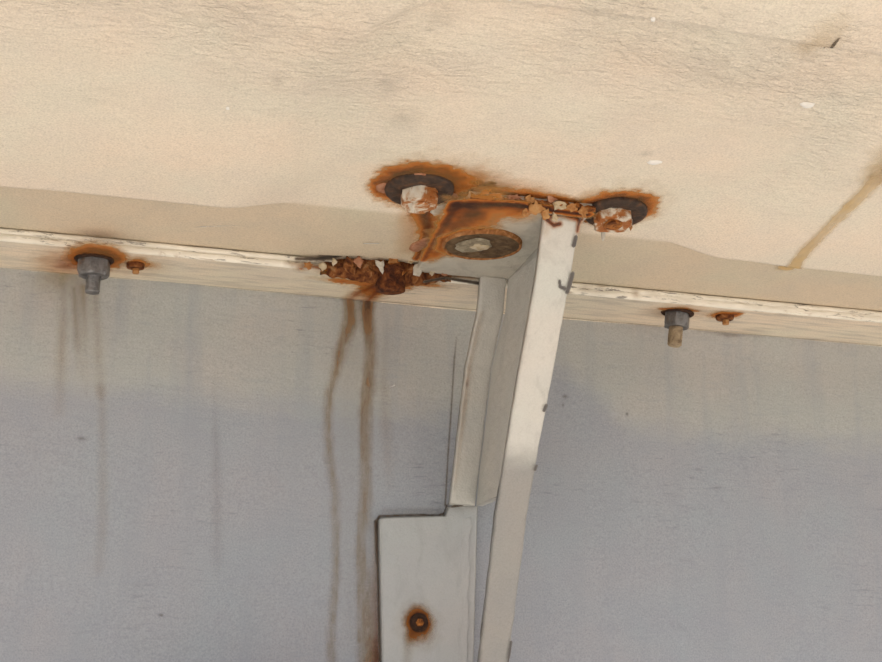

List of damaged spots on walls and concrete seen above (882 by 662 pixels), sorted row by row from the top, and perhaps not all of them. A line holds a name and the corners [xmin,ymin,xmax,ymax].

corrosion [57,243,151,270]
corrosion [295,160,660,436]
water stain [778,176,882,270]
corrosion [405,607,432,640]